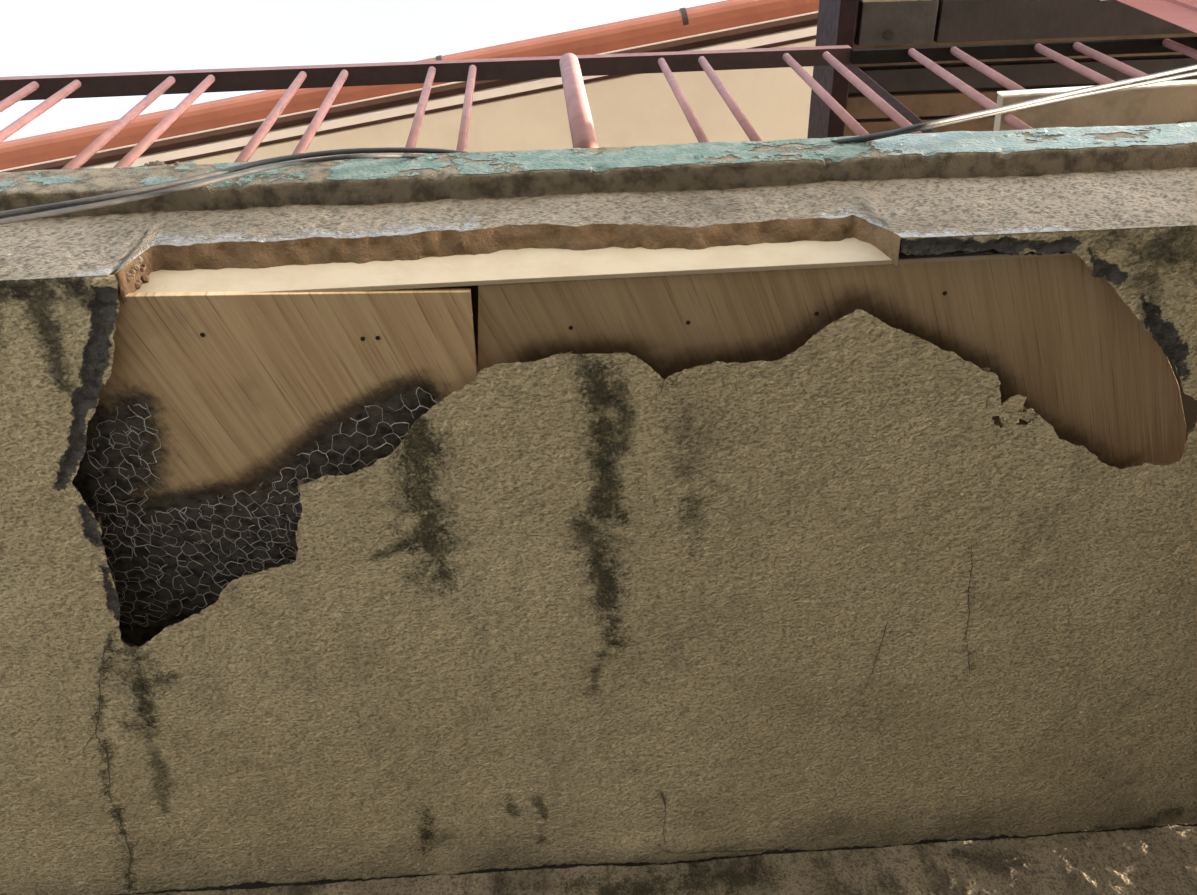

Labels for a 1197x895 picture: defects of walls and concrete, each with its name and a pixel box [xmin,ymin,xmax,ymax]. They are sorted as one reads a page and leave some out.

peeling [0,170,94,191]
peeling [119,159,313,188]
peeling [326,122,1197,180]
damp [0,277,101,391]
flaking render [1127,293,1190,394]
damp [372,416,458,595]
spalling [53,207,1128,648]
damp [523,297,1034,690]
damp [1051,423,1135,469]
crack [82,624,1197,895]